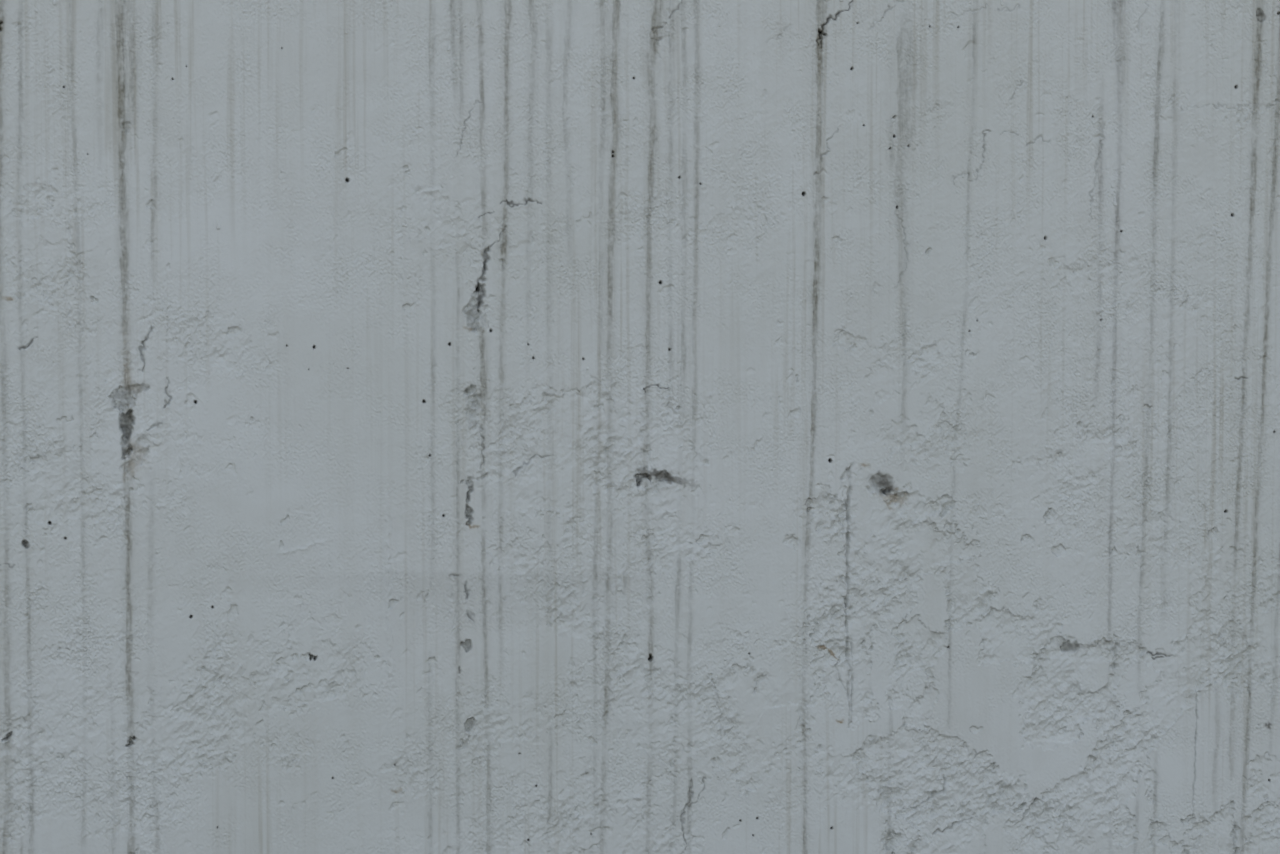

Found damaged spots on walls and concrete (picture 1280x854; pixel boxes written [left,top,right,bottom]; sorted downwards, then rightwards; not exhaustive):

peeling [467,368,729,587]
peeling [123,604,379,790]
crack [833,463,855,729]
spalling [801,468,1031,854]
spalling [1012,634,1144,751]
spalling [1147,748,1280,854]